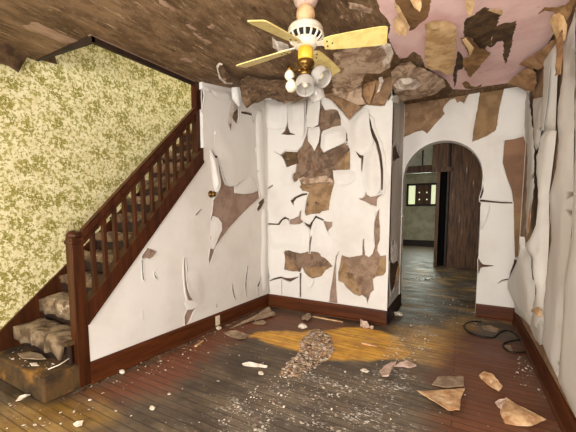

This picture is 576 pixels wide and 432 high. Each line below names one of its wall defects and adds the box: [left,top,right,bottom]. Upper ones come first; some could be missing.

peeling [393,0,431,36]
peeling [208,161,265,266]
peeling [273,93,352,232]
peeling [281,192,400,304]
peeling [356,85,392,112]
peeling [404,7,526,277]